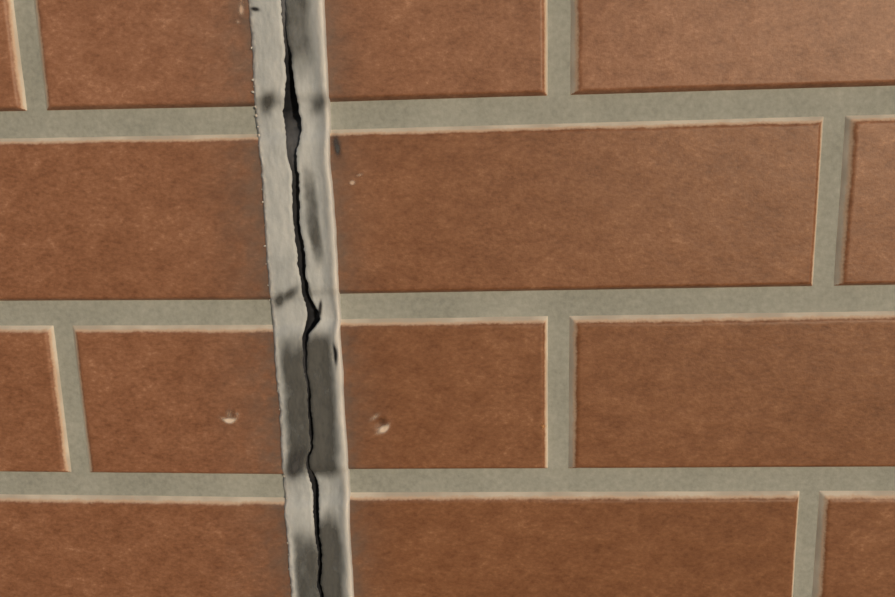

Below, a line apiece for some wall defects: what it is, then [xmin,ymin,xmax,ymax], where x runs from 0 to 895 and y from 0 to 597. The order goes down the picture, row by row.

crack [281,0,324,597]